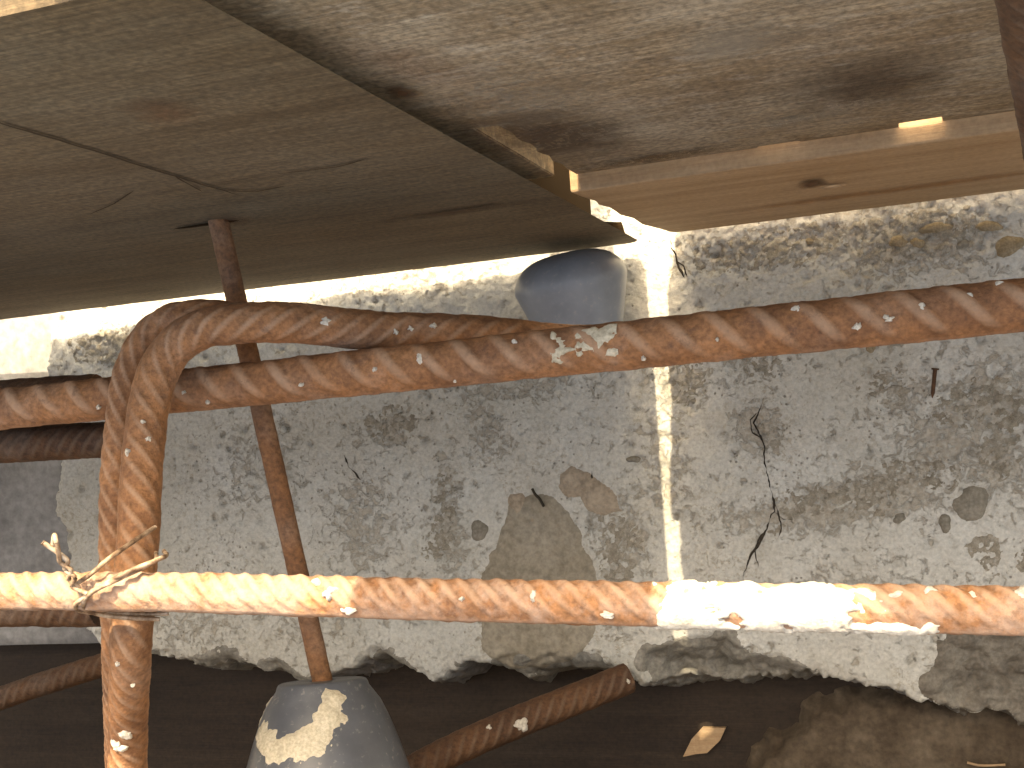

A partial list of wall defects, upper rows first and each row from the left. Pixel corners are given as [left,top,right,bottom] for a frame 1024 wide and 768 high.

crack [743,402,791,575]
peeling [481,466,622,581]
spalling [151,645,312,680]
spalling [372,647,417,671]
peeling [454,622,615,683]
spalling [634,630,818,686]
spalling [918,634,1024,726]